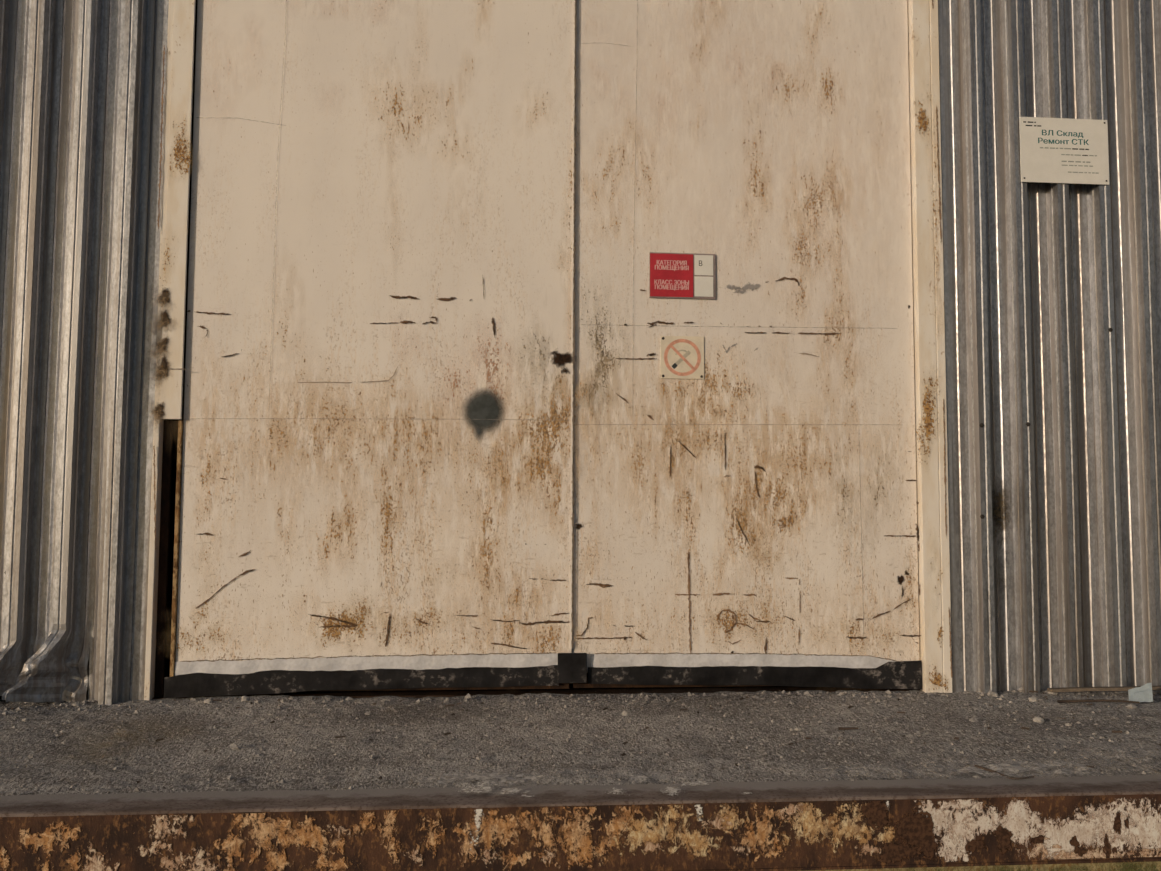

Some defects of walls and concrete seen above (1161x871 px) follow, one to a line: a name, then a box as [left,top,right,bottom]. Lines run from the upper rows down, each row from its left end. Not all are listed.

corrosion [772,69,838,114]
corrosion [914,93,942,273]
corrosion [197,416,237,525]
corrosion [250,284,899,655]
corrosion [915,372,947,536]
corrosion [177,574,239,652]
corrosion [857,801,939,863]
corrosion [965,823,1013,855]
peeling [914,797,1161,862]